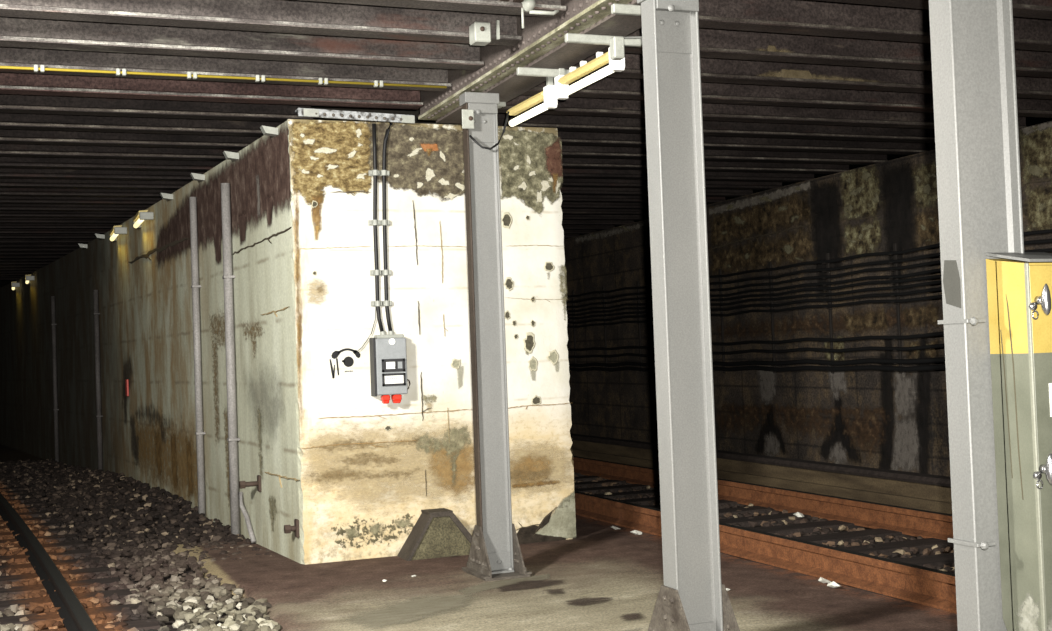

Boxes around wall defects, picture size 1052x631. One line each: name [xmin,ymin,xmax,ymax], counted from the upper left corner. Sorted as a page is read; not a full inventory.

peeling [291,120,465,208]
peeling [498,129,563,220]
corrosion [156,124,302,372]
corrosion [311,196,322,239]
crack [232,200,465,283]
spalling [501,212,512,229]
crack [261,307,288,317]
crack [418,302,445,335]
water stain [305,427,471,502]
water stain [821,398,861,462]
water stain [879,339,895,470]
water stain [917,338,930,474]